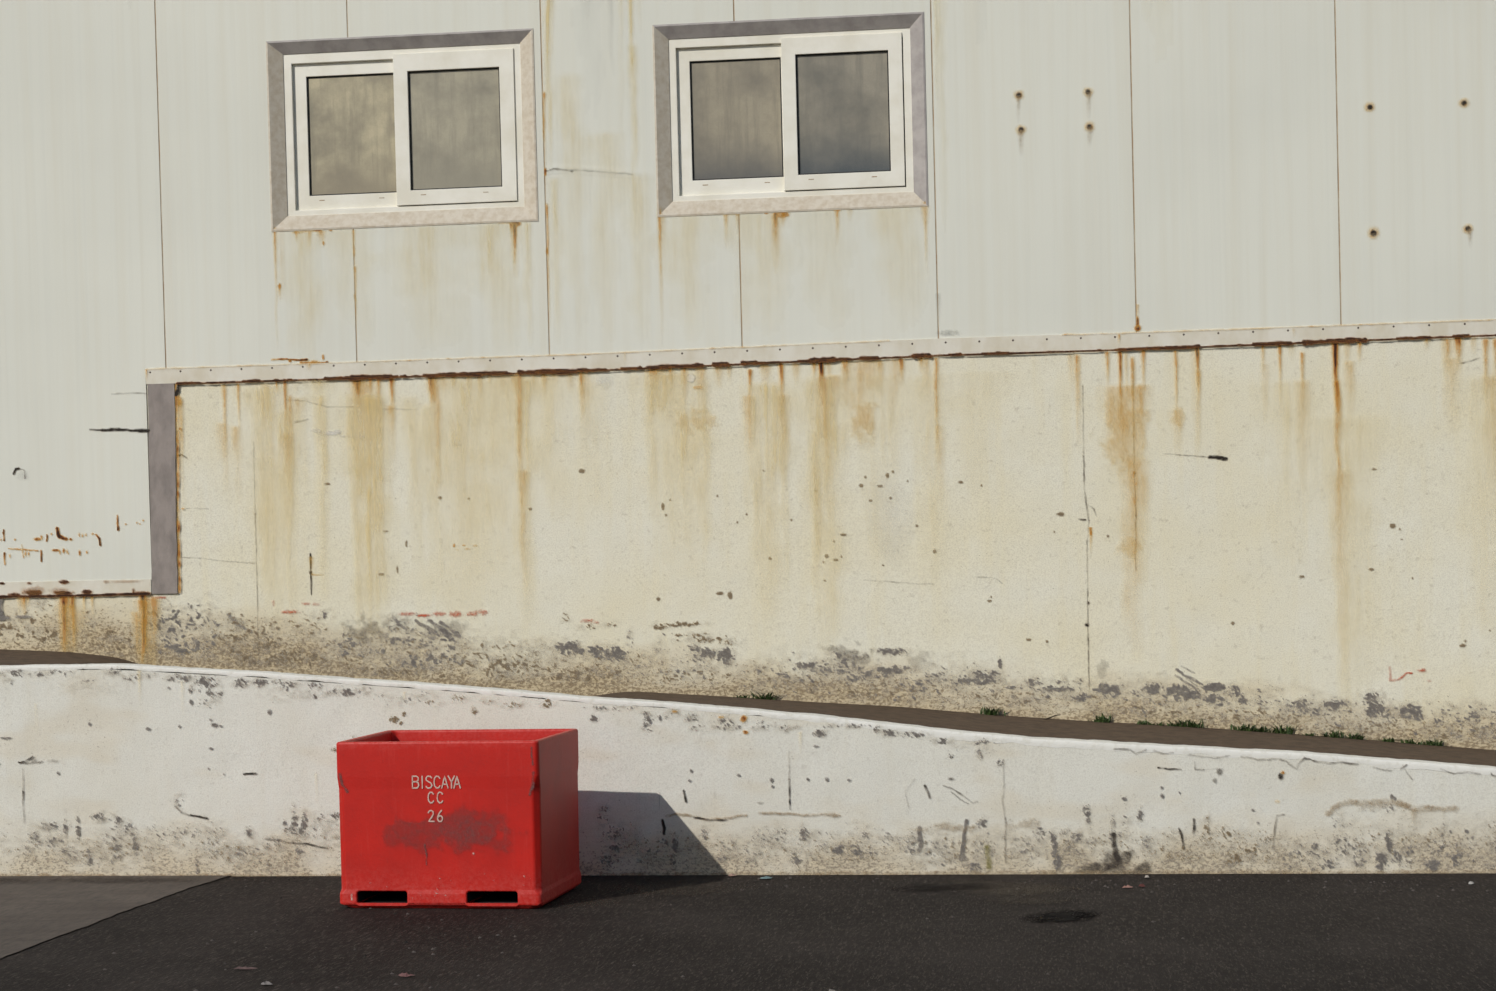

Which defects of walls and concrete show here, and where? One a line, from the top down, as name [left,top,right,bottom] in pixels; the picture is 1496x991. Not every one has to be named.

corrosion [510,222,520,254]
corrosion [175,317,1496,501]
corrosion [0,527,157,653]
damp [394,619,461,640]
damp [1033,832,1149,874]